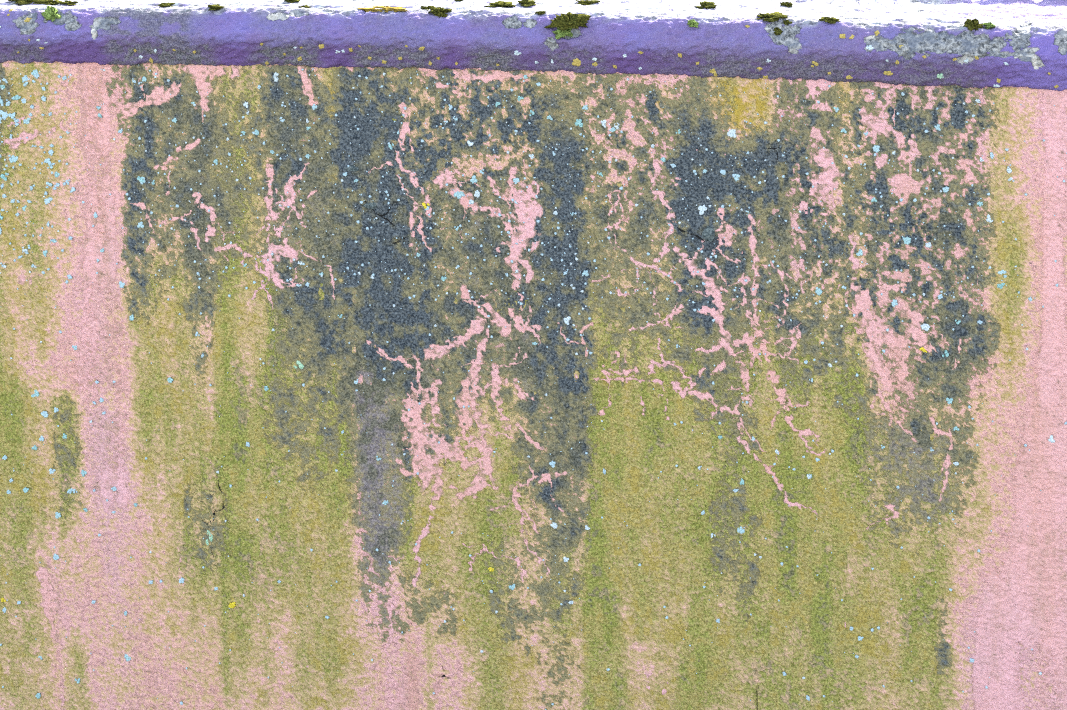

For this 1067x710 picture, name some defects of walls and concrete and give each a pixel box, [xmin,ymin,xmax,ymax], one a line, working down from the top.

peeling [12,11,121,40]
peeling [764,21,802,54]
peeling [864,20,1045,70]
peeling [1053,27,1067,55]
leakage [974,87,996,100]
leakage [878,343,898,367]
leakage [931,453,944,476]
leakage [920,501,935,513]
leakage [888,519,912,539]
leakage [934,629,952,675]